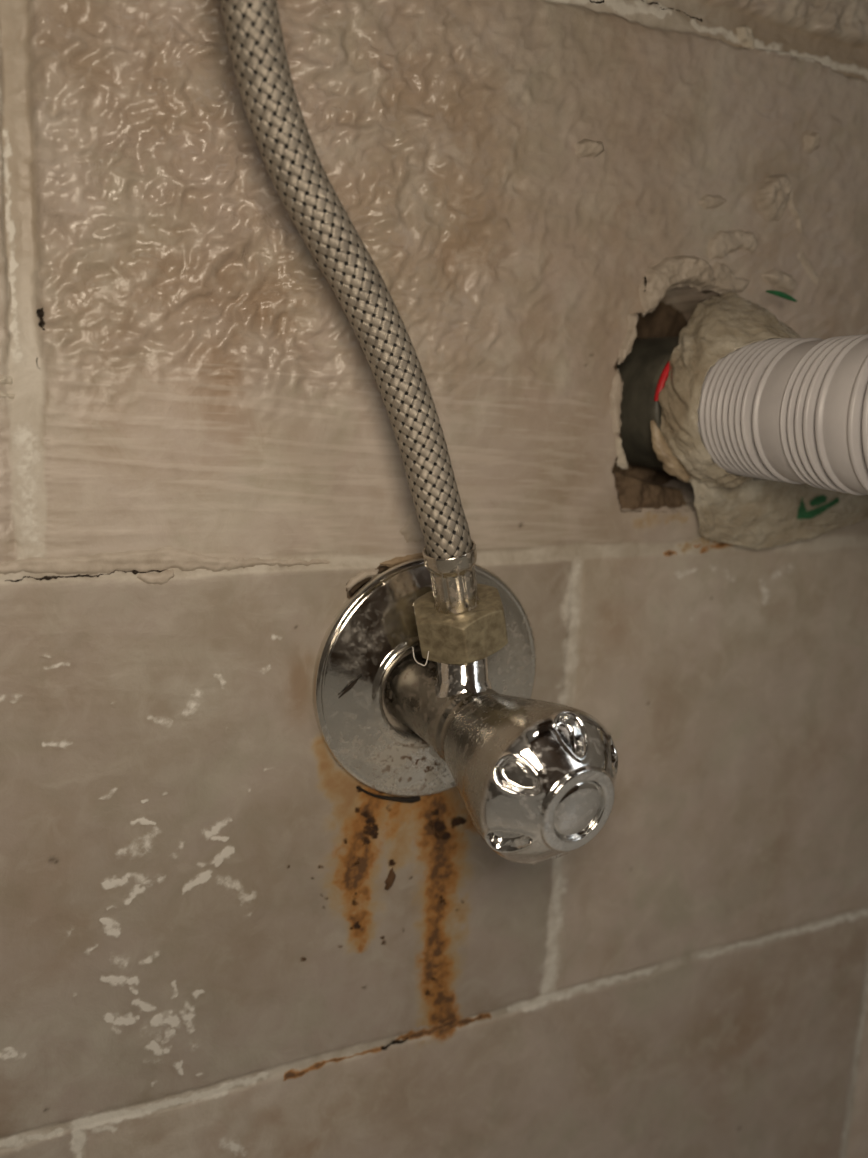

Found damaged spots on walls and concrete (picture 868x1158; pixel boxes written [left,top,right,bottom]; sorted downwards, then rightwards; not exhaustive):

spalling [610,255,797,512]
corrosion [280,727,494,1083]